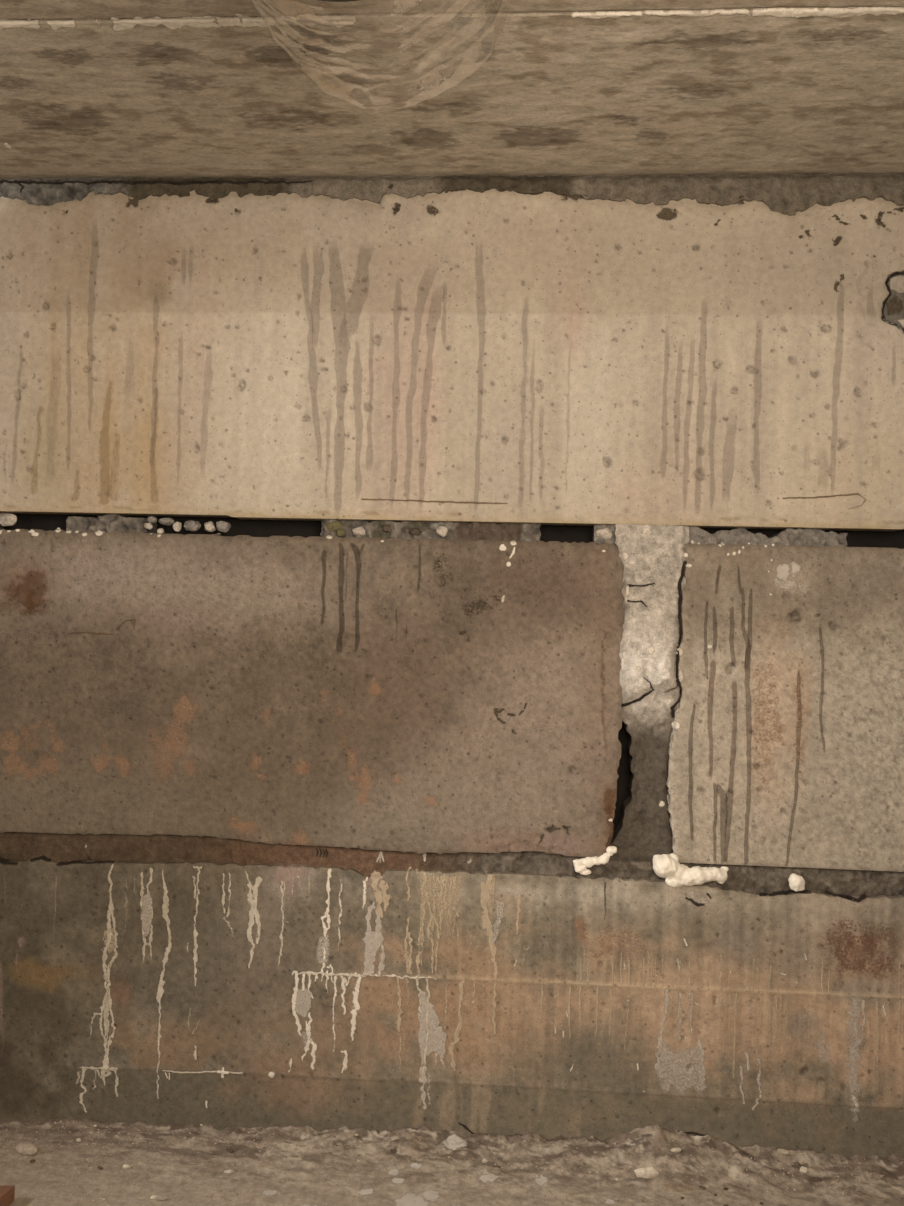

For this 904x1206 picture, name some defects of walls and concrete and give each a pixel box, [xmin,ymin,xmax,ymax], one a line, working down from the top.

spalling [881,272,904,332]
crack [621,561,687,718]
water stain [76,864,242,1113]
water stain [221,866,310,968]
water stain [268,867,521,1109]